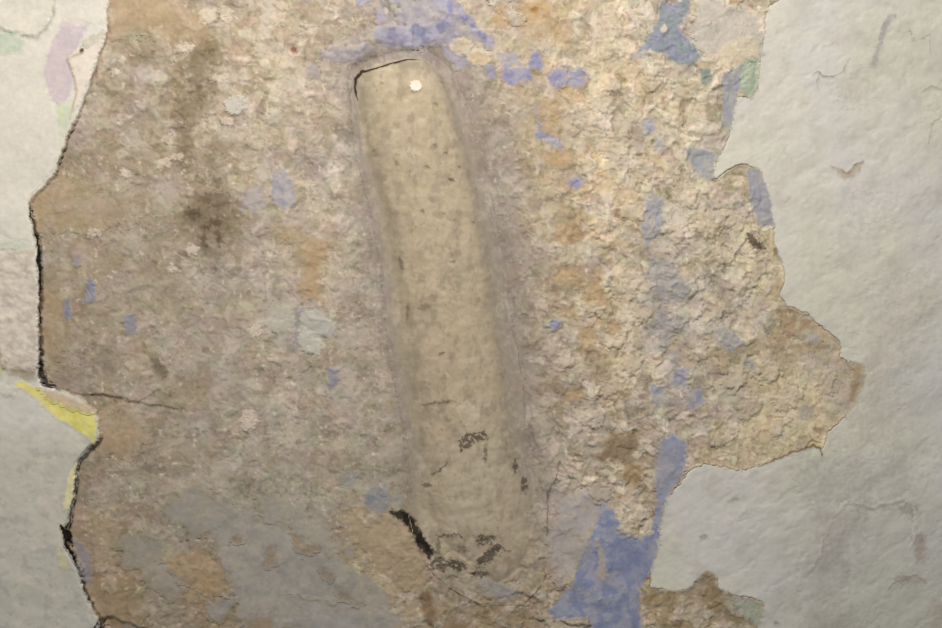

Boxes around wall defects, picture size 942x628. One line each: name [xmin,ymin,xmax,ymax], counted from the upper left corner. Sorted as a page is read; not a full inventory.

crack [349,59,420,113]
peeling [0,0,109,251]
crack [28,8,184,412]
peeling [0,248,44,383]
peeling [685,337,711,364]
peeling [421,398,491,463]
peeling [586,476,616,506]
peeling [615,492,648,540]
spalling [367,571,403,612]
peeling [430,532,472,573]
peeling [471,533,523,604]
peeling [639,569,765,628]